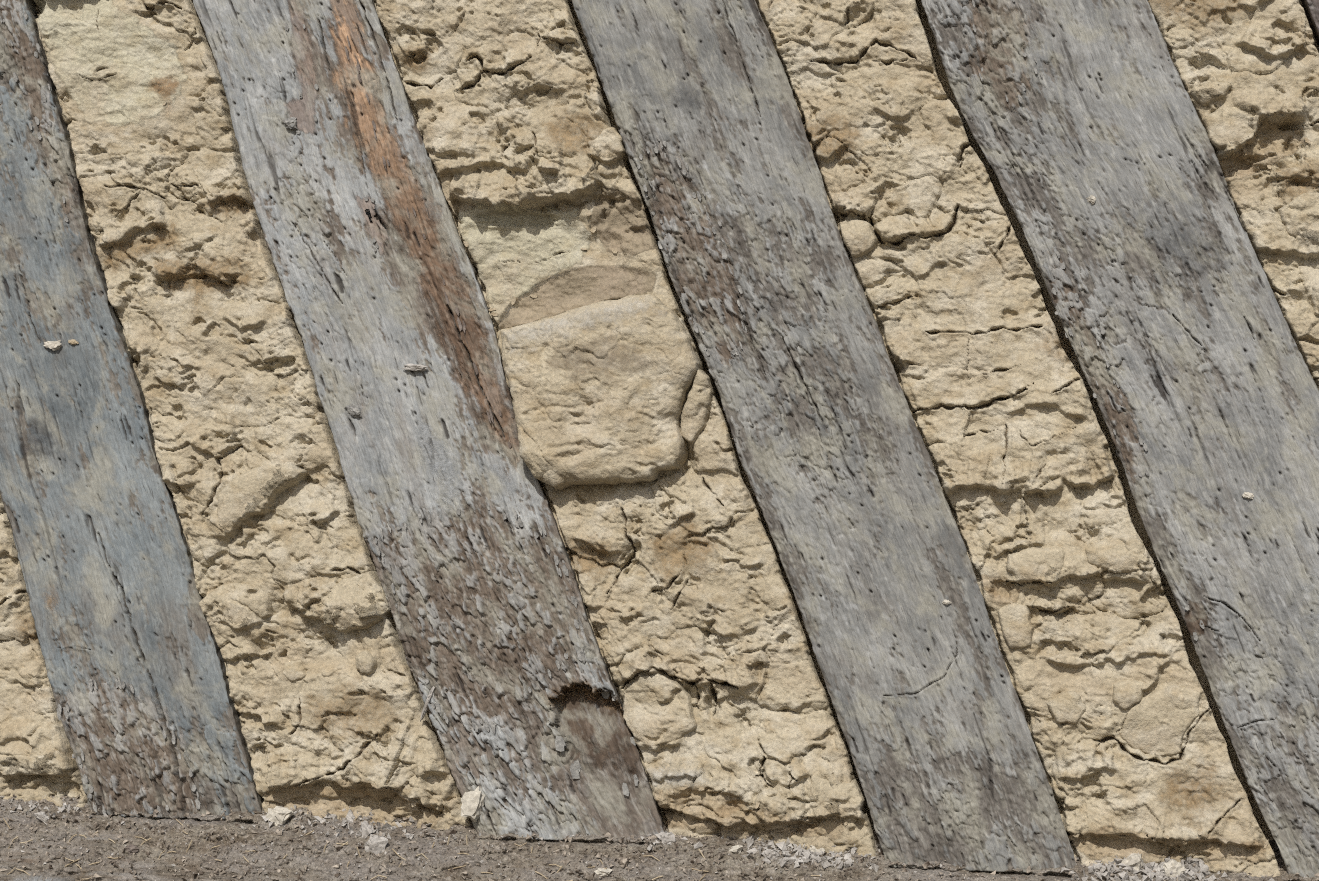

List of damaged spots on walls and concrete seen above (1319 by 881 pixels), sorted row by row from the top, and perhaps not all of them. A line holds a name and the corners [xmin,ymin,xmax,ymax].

crack [319,21,330,70]
crack [360,1,590,119]
crack [607,509,636,594]
crack [647,551,688,607]
peeling [555,735,582,779]
crack [1099,711,1207,765]